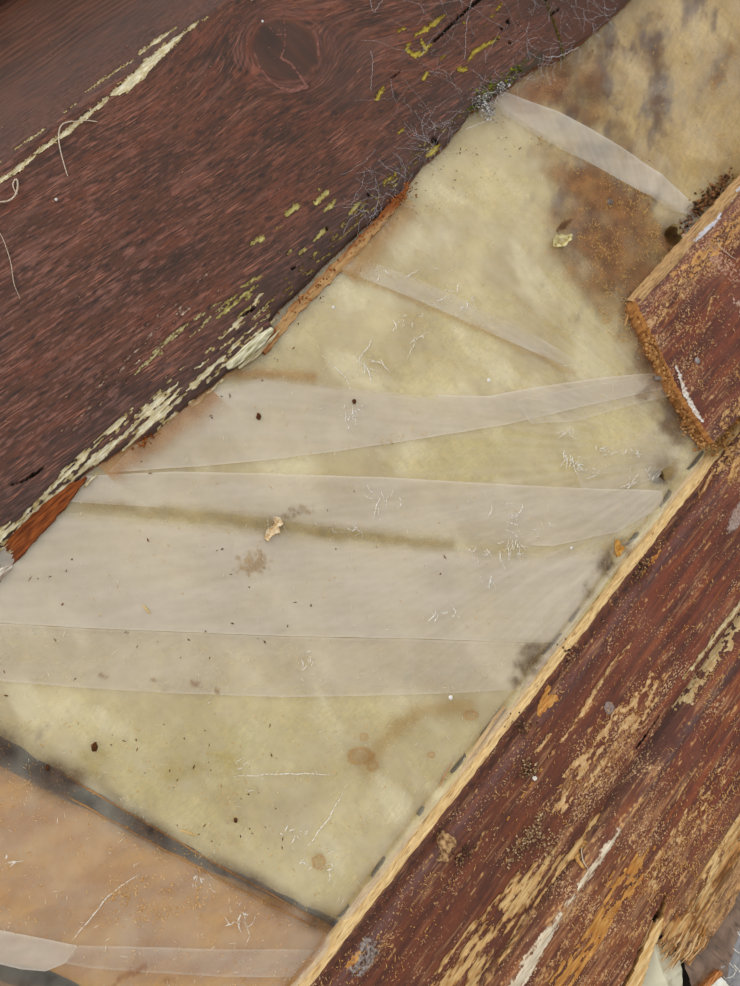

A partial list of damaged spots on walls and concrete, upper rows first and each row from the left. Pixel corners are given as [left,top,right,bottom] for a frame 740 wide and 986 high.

crack [433,0,481,43]
crack [544,0,565,59]
peeling [0,16,208,184]
peeling [287,111,464,275]
damp [552,165,671,305]
peeling [650,212,740,337]
peeling [0,275,293,553]
peeling [696,435,740,501]
peeling [534,643,632,757]
peeling [672,601,740,710]
peeling [430,671,660,986]
peeling [550,760,740,986]